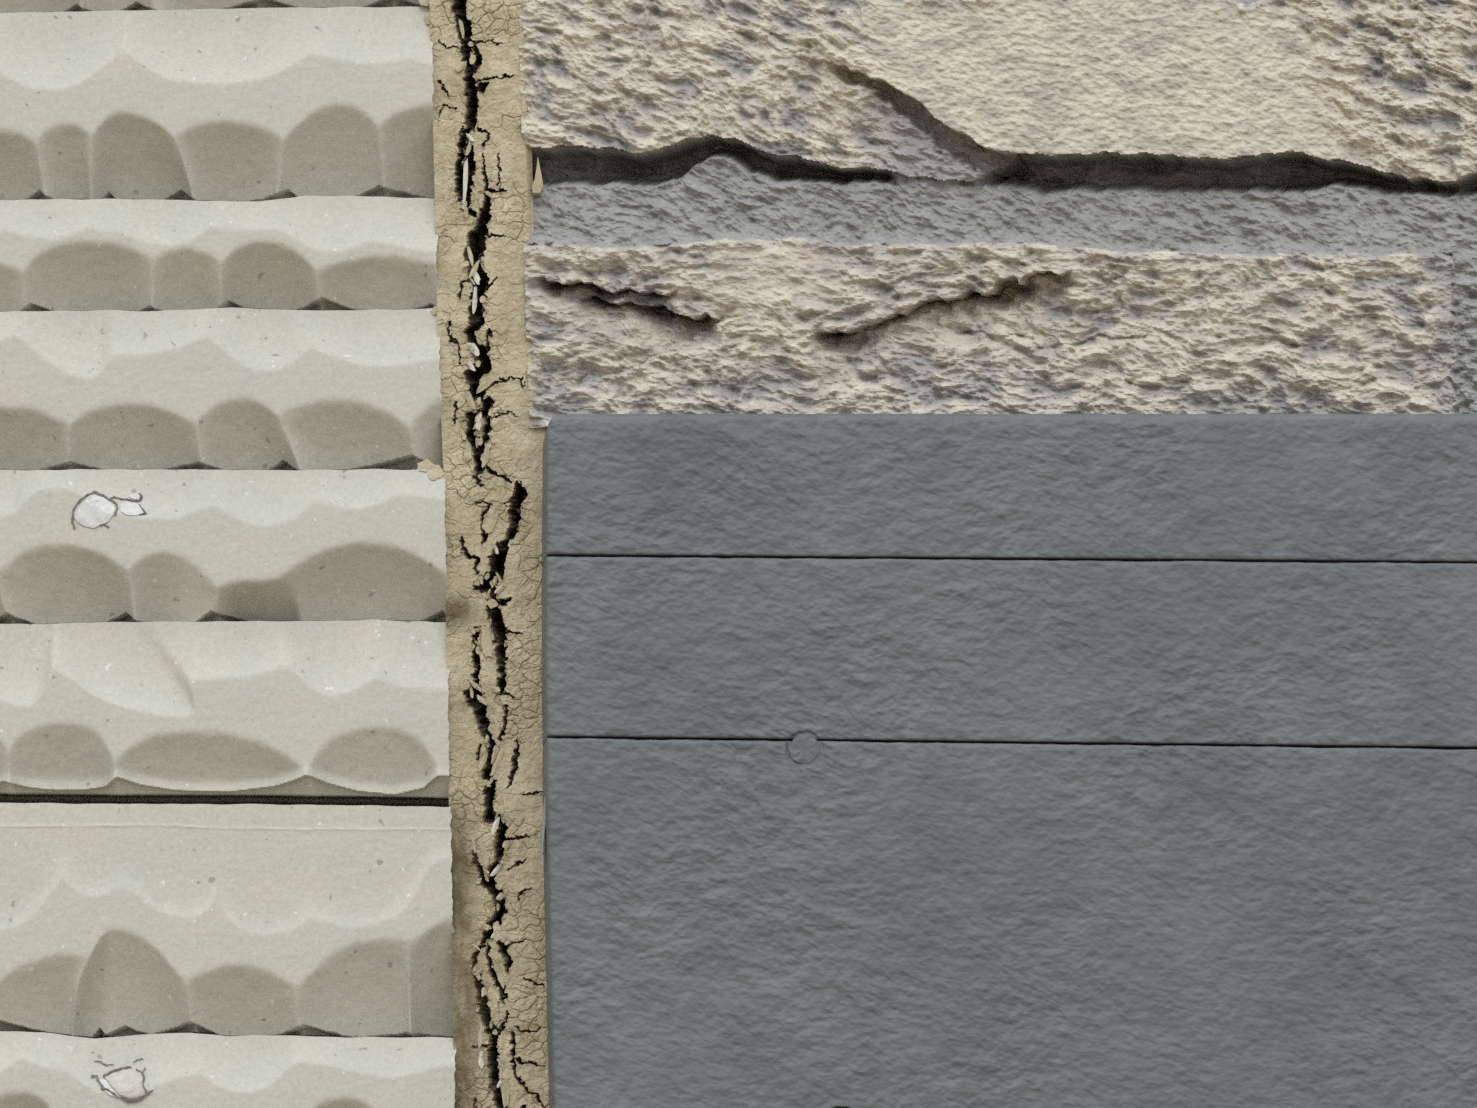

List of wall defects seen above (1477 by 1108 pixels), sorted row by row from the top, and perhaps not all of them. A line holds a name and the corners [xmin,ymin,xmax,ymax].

peeling [71,490,147,529]
crack [438,0,545,1108]
peeling [91,1058,153,1102]